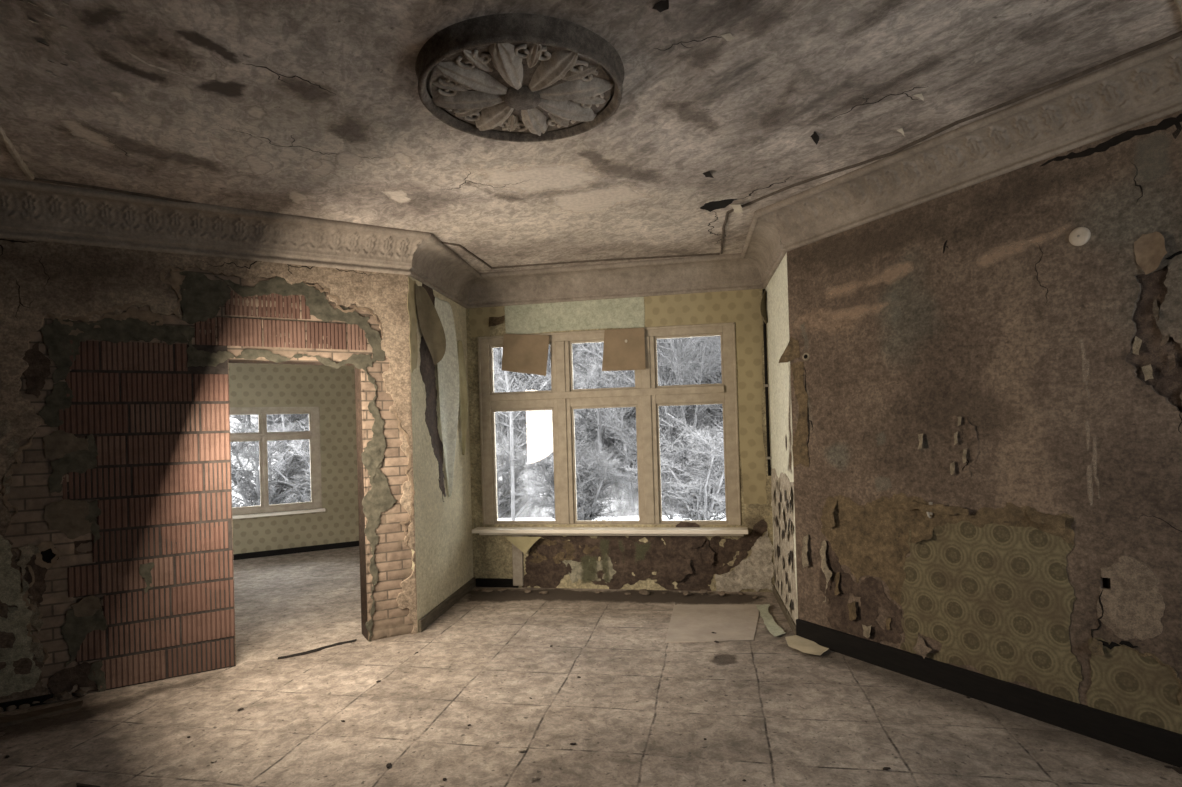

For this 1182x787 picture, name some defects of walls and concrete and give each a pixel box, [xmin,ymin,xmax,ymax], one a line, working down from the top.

water stain [61,120,112,147]
water stain [101,31,246,97]
water stain [384,190,410,202]
water stain [484,166,649,212]
spalling [1127,231,1182,434]
spalling [0,264,415,697]
peeling [419,334,446,497]
spalling [522,468,904,644]